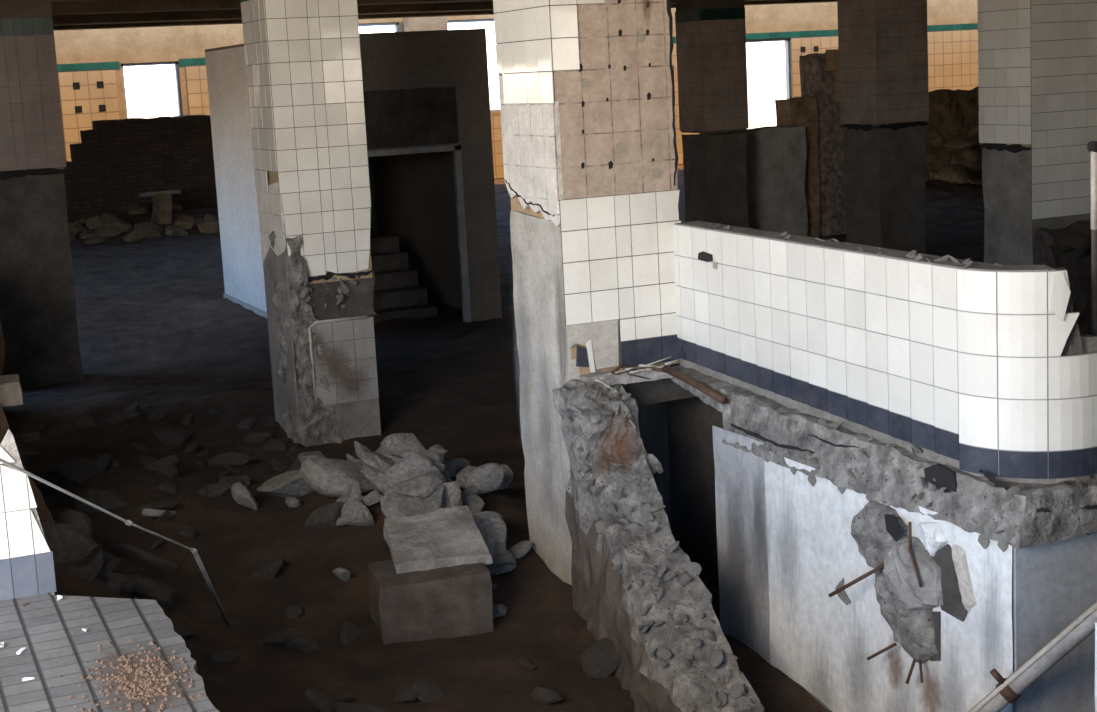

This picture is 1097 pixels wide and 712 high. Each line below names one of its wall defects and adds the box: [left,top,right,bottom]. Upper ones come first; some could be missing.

spalling [498,0,678,227]
crack [667,0,679,186]
spalling [257,182,377,447]
corrosion [663,365,727,404]
spalling [622,363,1097,684]